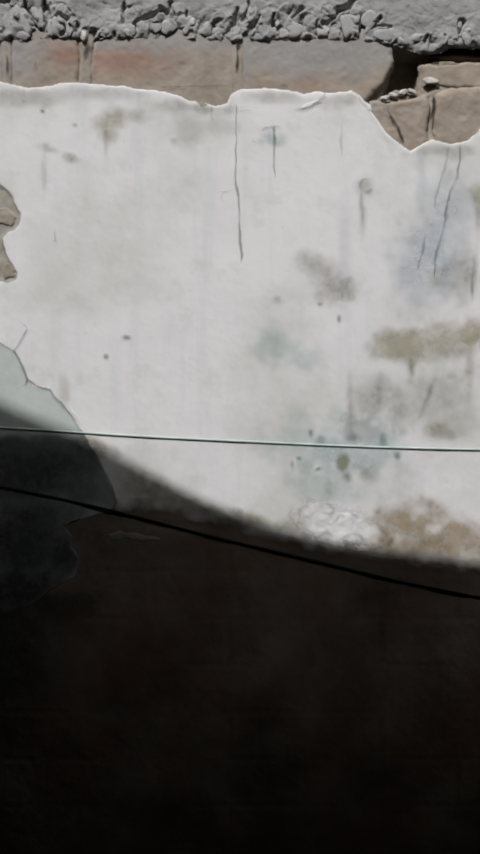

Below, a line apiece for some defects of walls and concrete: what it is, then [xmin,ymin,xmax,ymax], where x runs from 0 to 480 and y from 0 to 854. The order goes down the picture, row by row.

spalling [0,0,480,151]
peeling [0,185,21,282]
peeling [0,343,480,854]